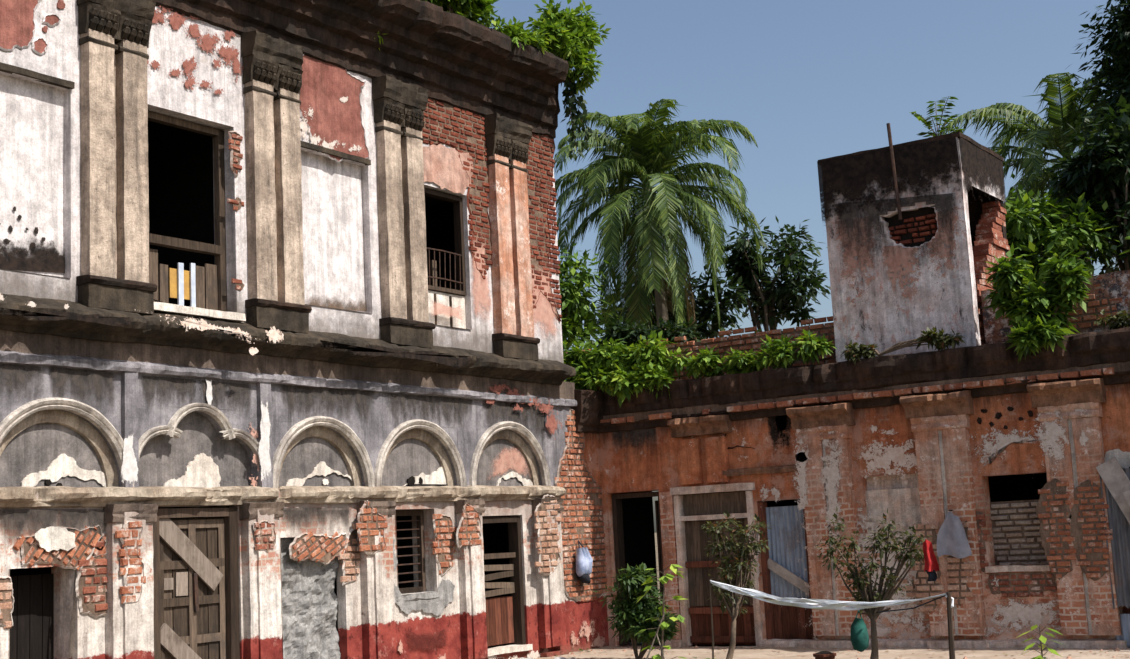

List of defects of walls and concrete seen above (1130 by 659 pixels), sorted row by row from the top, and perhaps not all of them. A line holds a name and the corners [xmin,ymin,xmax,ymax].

peeling [0,0,65,55]
peeling [147,5,243,95]
peeling [299,54,369,163]
water stain [0,206,65,273]
flaking render [422,98,493,279]
flaking render [526,129,562,321]
water stain [817,137,1006,253]
peeling [21,453,106,487]
flaking render [13,521,146,618]
flaking render [253,500,482,616]
flaking render [485,382,608,603]
flaking render [775,406,1113,640]